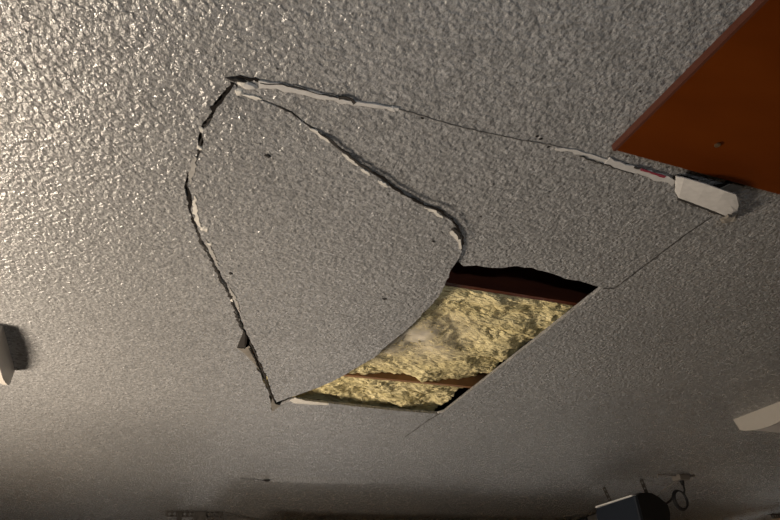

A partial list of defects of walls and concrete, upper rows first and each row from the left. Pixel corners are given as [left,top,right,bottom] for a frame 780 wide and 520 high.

crack [399,109,563,148]
crack [185,76,464,402]
crack [603,217,712,289]